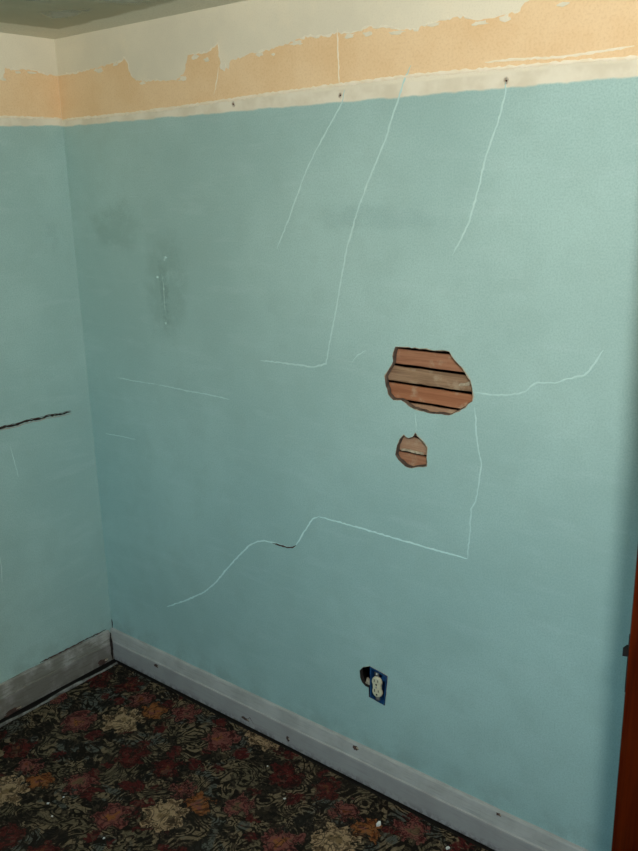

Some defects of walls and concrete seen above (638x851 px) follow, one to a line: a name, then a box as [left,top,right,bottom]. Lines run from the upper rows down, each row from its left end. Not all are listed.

crack [277,29,345,248]
peeling [0,0,638,120]
crack [261,66,411,368]
crack [452,45,634,255]
crack [0,410,72,477]
crack [167,350,604,607]
flaking render [395,433,428,468]
flaking render [384,347,474,415]